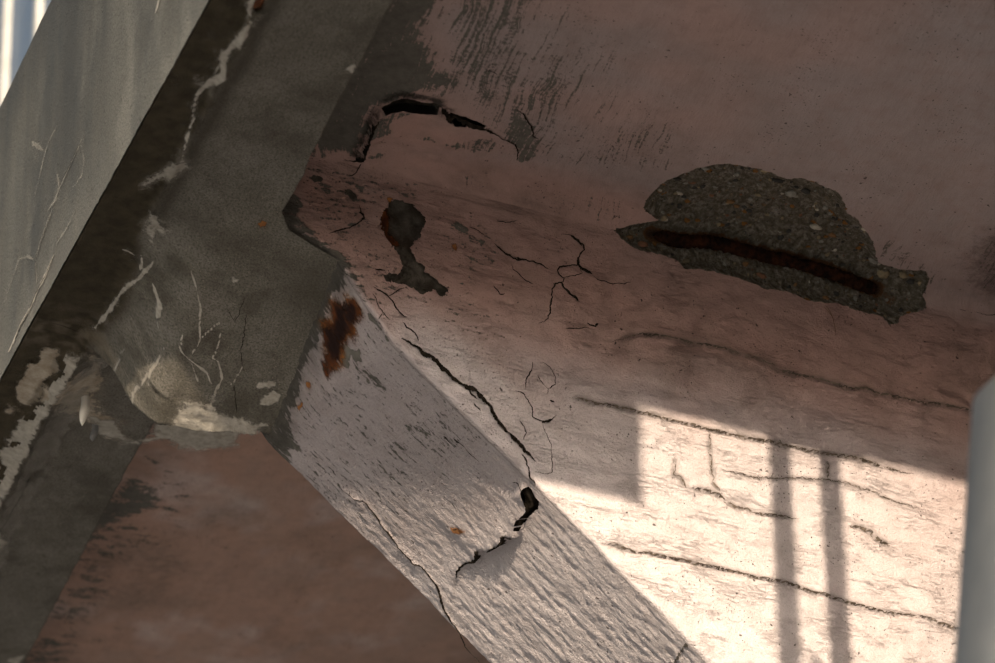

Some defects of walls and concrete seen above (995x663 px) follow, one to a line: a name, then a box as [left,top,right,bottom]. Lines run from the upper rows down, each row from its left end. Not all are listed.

water stain [143,0,255,186]
crack [346,91,538,176]
crack [331,205,365,233]
flaking render [380,199,448,297]
crack [471,220,628,329]
spalling [614,164,930,324]
water stain [256,380,281,406]
corrosion [318,293,364,377]
crack [373,269,556,486]